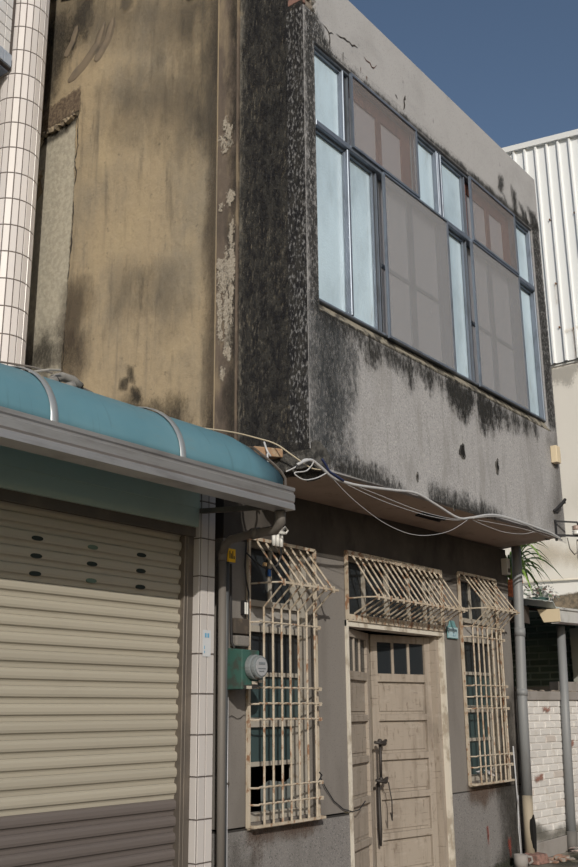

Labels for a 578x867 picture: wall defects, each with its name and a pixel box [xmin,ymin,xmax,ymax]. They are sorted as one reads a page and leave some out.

damp [43,0,92,105]
crack [326,28,377,78]
peeling [218,116,233,154]
peeling [218,189,235,212]
damp [225,0,556,489]
damp [207,114,217,429]
peeling [216,219,235,381]
damp [120,368,140,406]
damp [156,401,180,420]
damp [429,484,497,520]